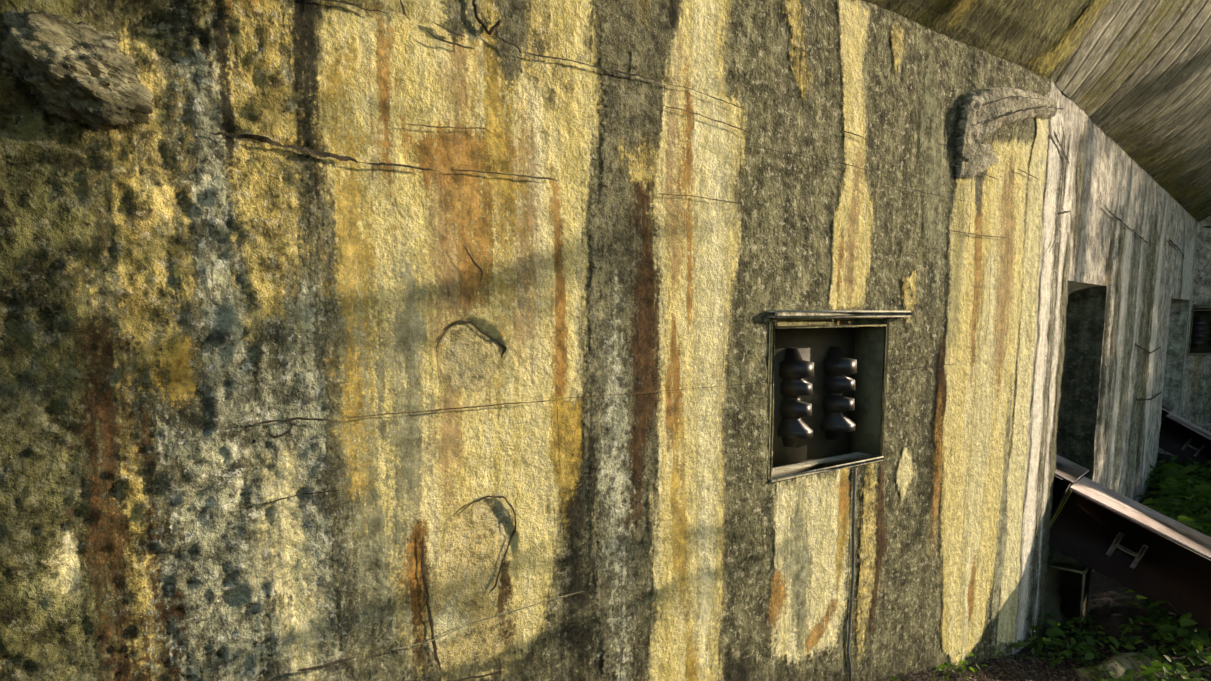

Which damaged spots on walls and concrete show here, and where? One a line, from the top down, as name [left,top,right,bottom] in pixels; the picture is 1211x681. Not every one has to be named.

rust [62,317,222,681]
crack [211,132,558,181]
rust [399,519,518,681]
leakage [69,0,936,681]
crack [322,0,1077,340]
leakage [919,0,1211,666]
crack [1104,206,1185,259]